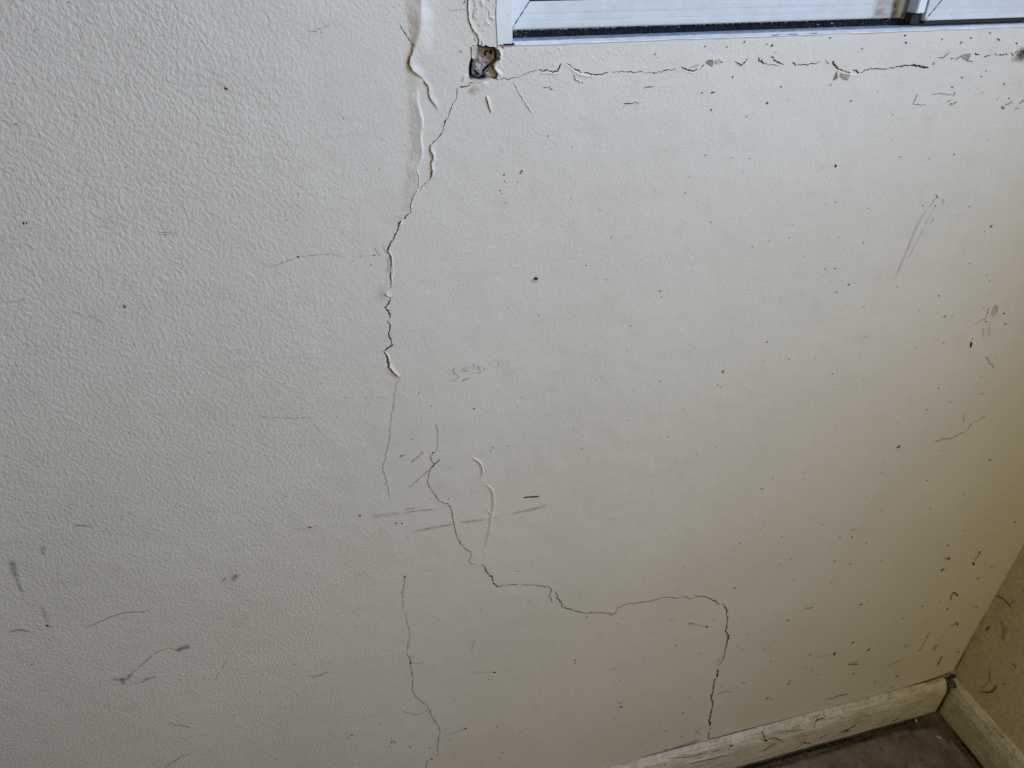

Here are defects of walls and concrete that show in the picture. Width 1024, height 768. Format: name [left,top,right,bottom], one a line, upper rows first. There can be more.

crack [450,0,497,46]
spalling [460,38,505,114]
crack [501,51,1017,105]
crack [374,87,458,498]
crack [401,576,441,767]
crack [427,425,732,764]